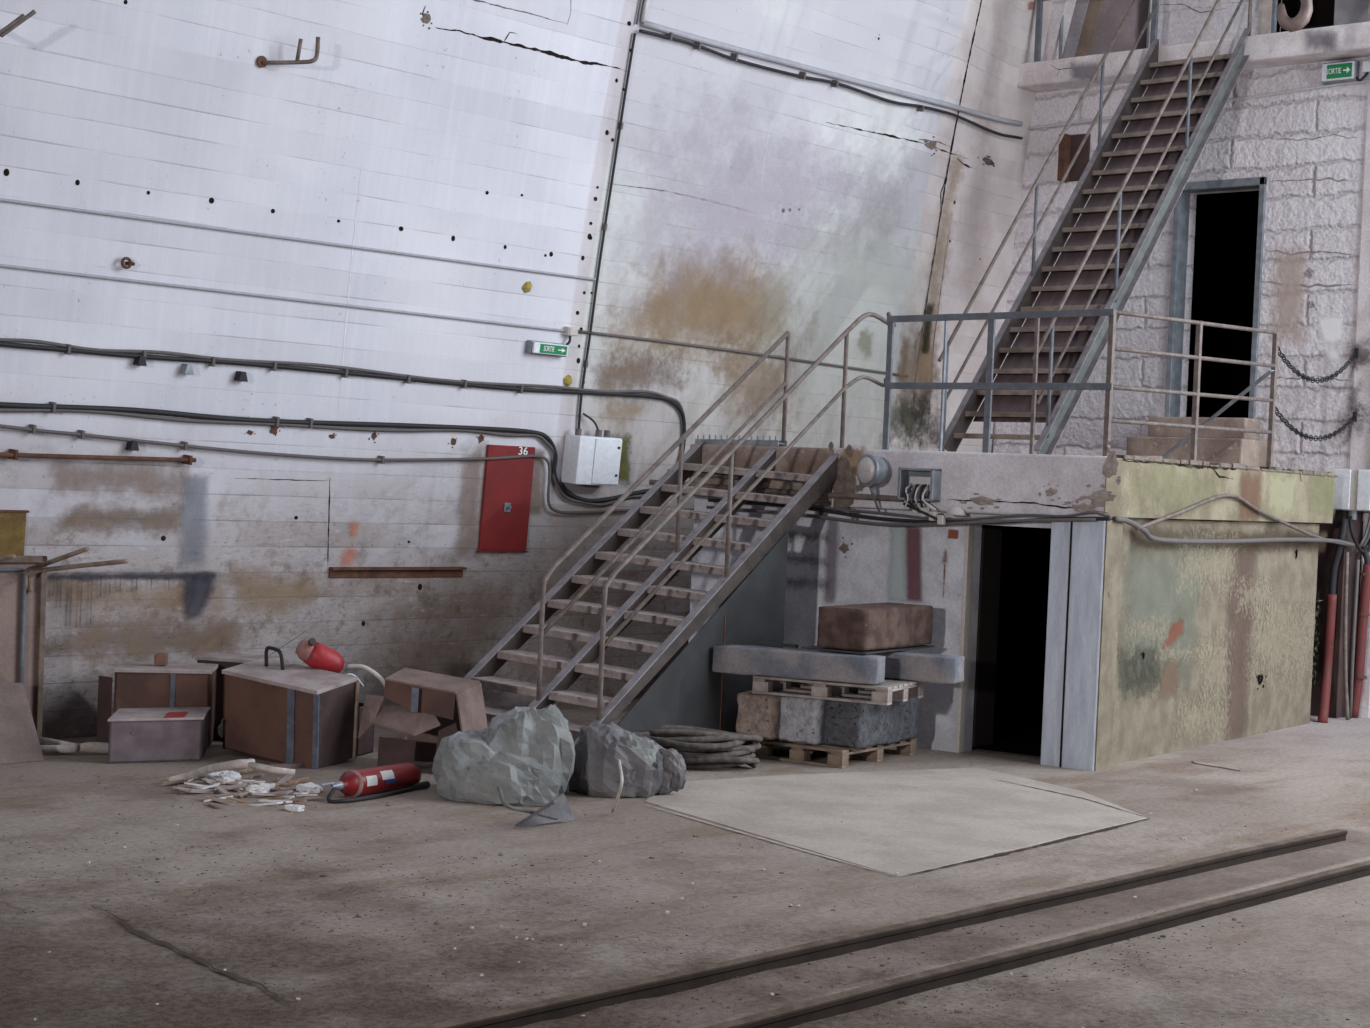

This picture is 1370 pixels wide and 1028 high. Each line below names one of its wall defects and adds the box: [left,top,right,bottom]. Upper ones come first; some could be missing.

crack [422,0,625,71]
damp [652,265,783,337]
damp [859,331,872,356]
damp [889,304,939,446]
spalling [959,493,1001,509]
damp [1132,530,1326,737]
damp [1119,648,1178,696]